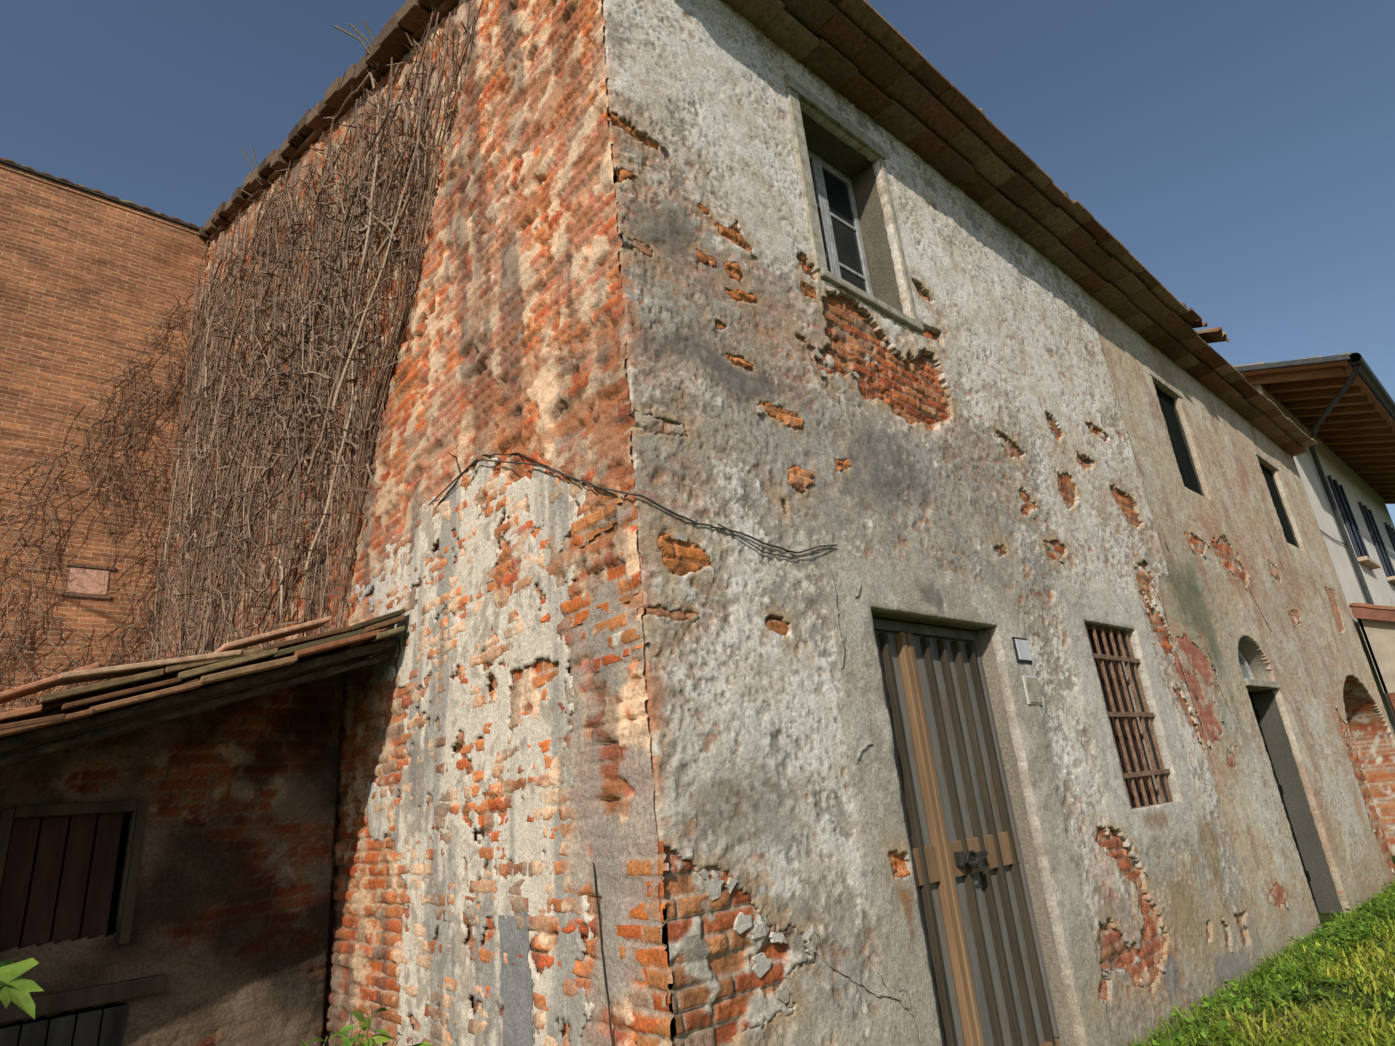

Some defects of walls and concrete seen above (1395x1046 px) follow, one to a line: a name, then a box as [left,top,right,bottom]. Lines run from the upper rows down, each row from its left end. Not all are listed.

flaking render [696,204,758,304]
flaking render [796,254,950,431]
flaking render [658,532,712,576]
flaking render [765,616,789,636]
peeling [1133,557,1237,768]
flaking render [1184,532,1251,589]
peeling [343,456,699,1046]
flaking render [616,841,817,1046]
crack [814,930,923,1046]
flaking render [889,851,910,879]
flaking render [1096,827,1167,1000]
flaking render [1336,705,1395,875]